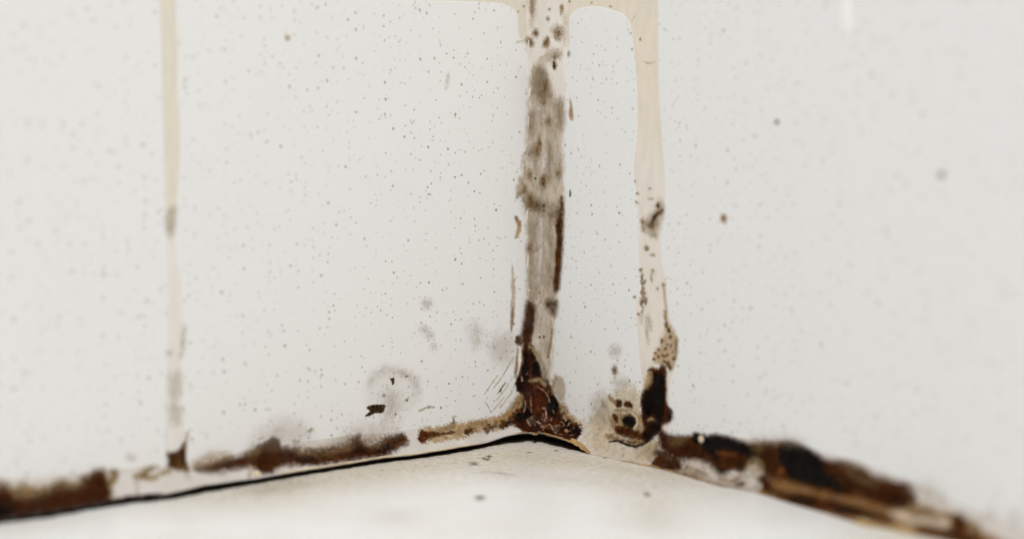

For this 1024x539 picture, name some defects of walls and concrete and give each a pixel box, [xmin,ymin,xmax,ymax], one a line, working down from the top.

water stain [418,0,997,539]
water stain [134,433,408,481]
peeling [570,438,591,454]
water stain [0,470,119,517]